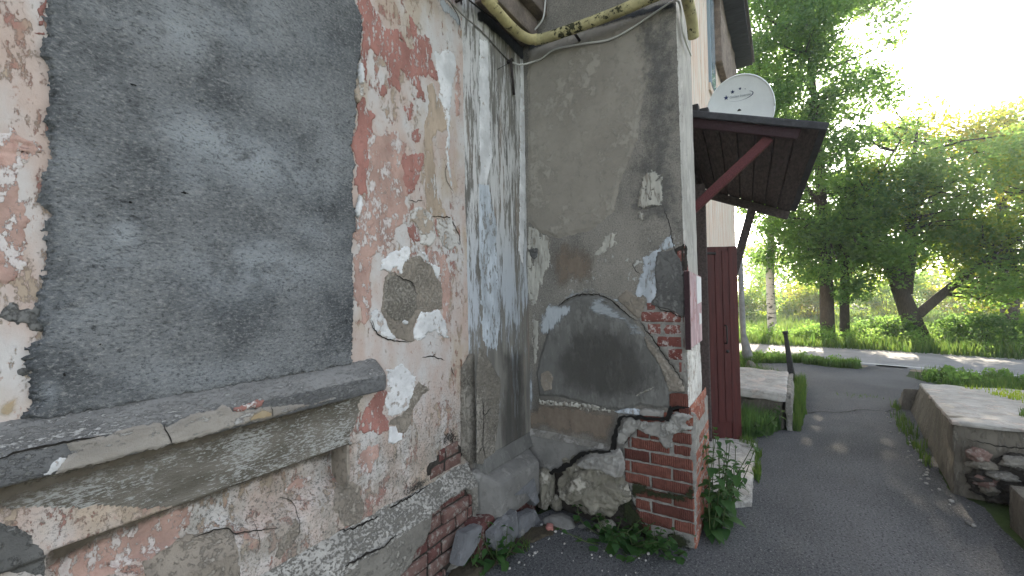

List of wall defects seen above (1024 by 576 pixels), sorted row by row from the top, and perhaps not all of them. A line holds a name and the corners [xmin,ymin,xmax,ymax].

damp [477,11,543,59]
damp [596,3,674,27]
peeling [351,0,461,343]
flaking render [674,240,688,271]
spalling [44,397,336,475]
spalling [332,381,430,527]
spalling [427,348,501,480]
crack [549,293,689,475]
flaking render [618,290,702,409]
crack [192,497,300,548]
crack [339,484,430,567]
flaking render [401,490,473,576]